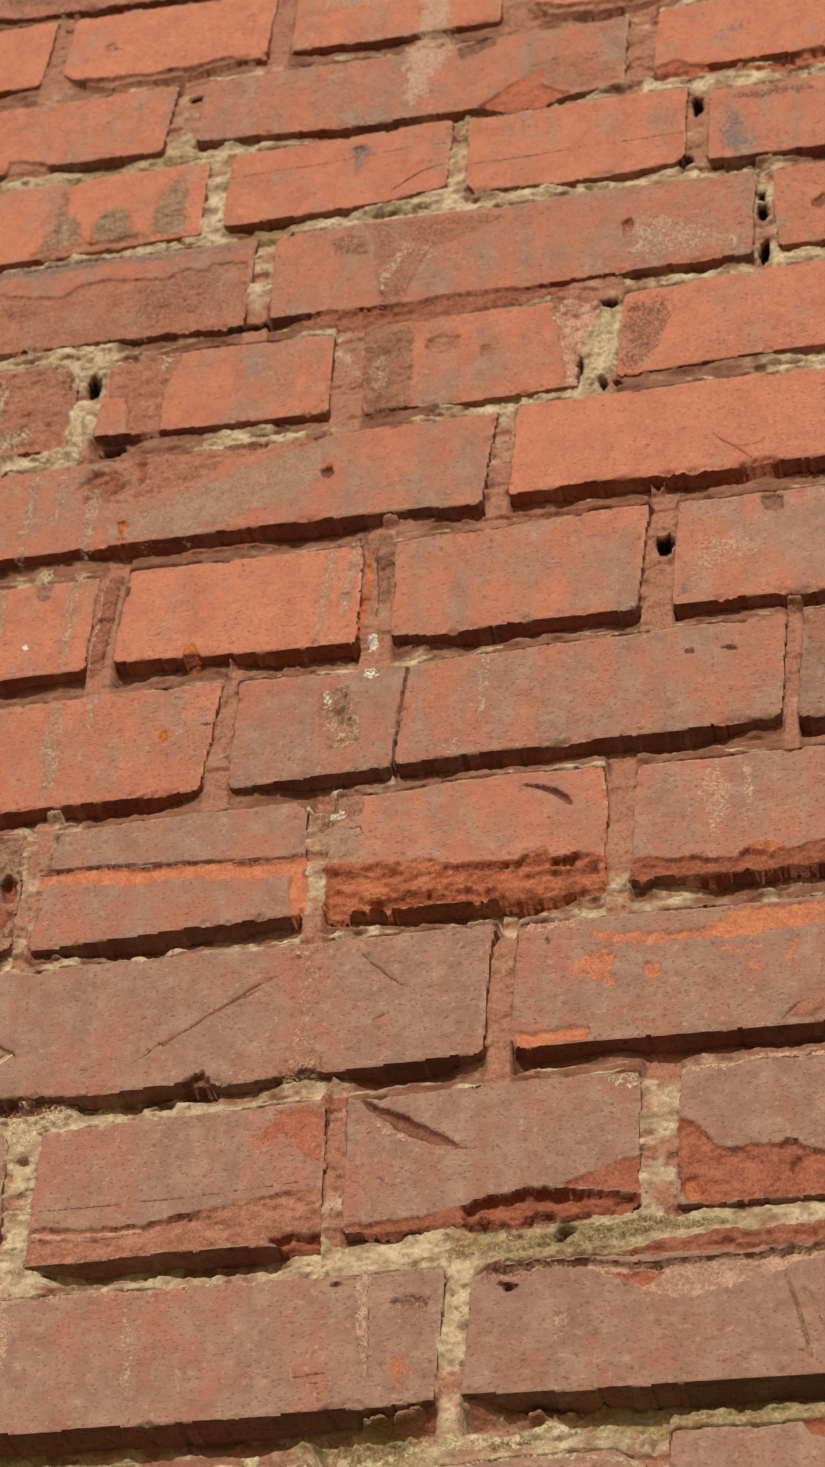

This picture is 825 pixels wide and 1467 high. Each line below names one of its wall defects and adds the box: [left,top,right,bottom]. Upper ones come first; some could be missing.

spalling [522,784,573,805]
spalling [0,838,25,946]
spalling [37,838,825,990]
crack [131,973,283,1064]
peeling [26,1187,323,1270]
spalling [344,1156,641,1243]
spalling [677,1115,825,1206]
peeling [605,1271,664,1286]